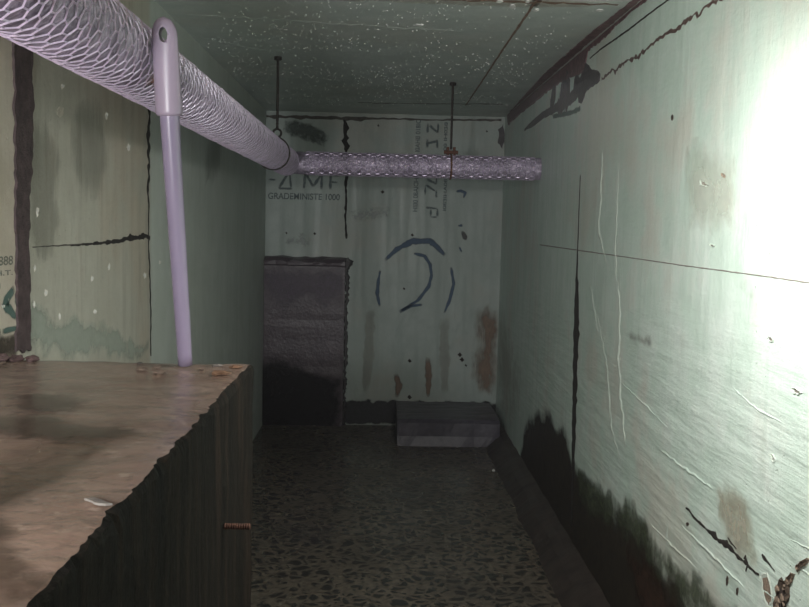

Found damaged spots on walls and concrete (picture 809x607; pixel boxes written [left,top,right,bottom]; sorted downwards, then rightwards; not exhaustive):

crack [266,0,618,152]
crack [590,0,669,59]
crack [602,0,723,80]
crack [342,175,350,239]
corrosion [477,313,497,390]
crack [541,175,809,527]
water stain [521,412,714,607]
crack [686,507,774,576]
spalling [761,558,809,607]